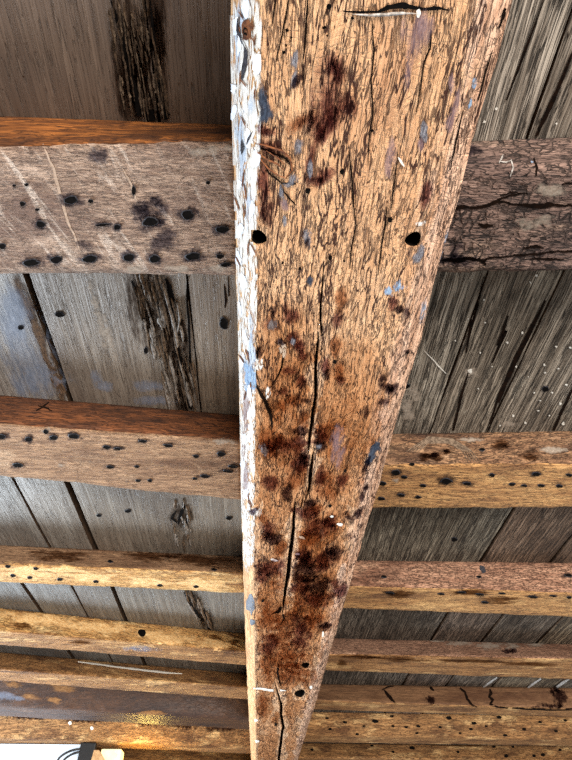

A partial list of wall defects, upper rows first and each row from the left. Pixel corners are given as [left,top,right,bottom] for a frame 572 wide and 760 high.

leakage [295,59,356,186]
leakage [287,333,307,360]
leakage [259,426,328,473]
crack [272,264,324,624]
leakage [361,441,381,474]
leakage [261,466,337,538]
leakage [345,485,369,522]
leakage [261,522,282,546]
leakage [256,546,347,609]
crack [276,666,285,760]
crack [382,686,396,704]
crack [460,687,572,711]